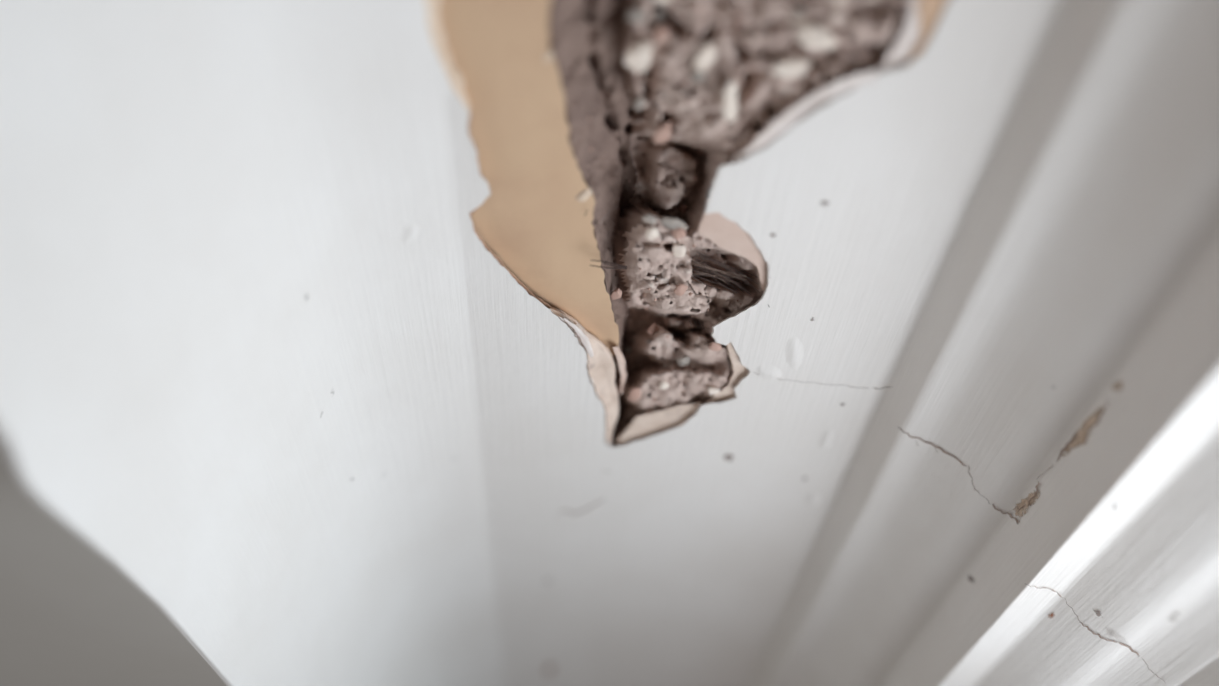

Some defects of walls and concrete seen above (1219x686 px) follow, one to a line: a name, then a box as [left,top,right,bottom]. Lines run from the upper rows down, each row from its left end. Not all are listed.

spalling [426,0,947,447]
crack [900,428,977,491]
crack [1036,587,1159,678]